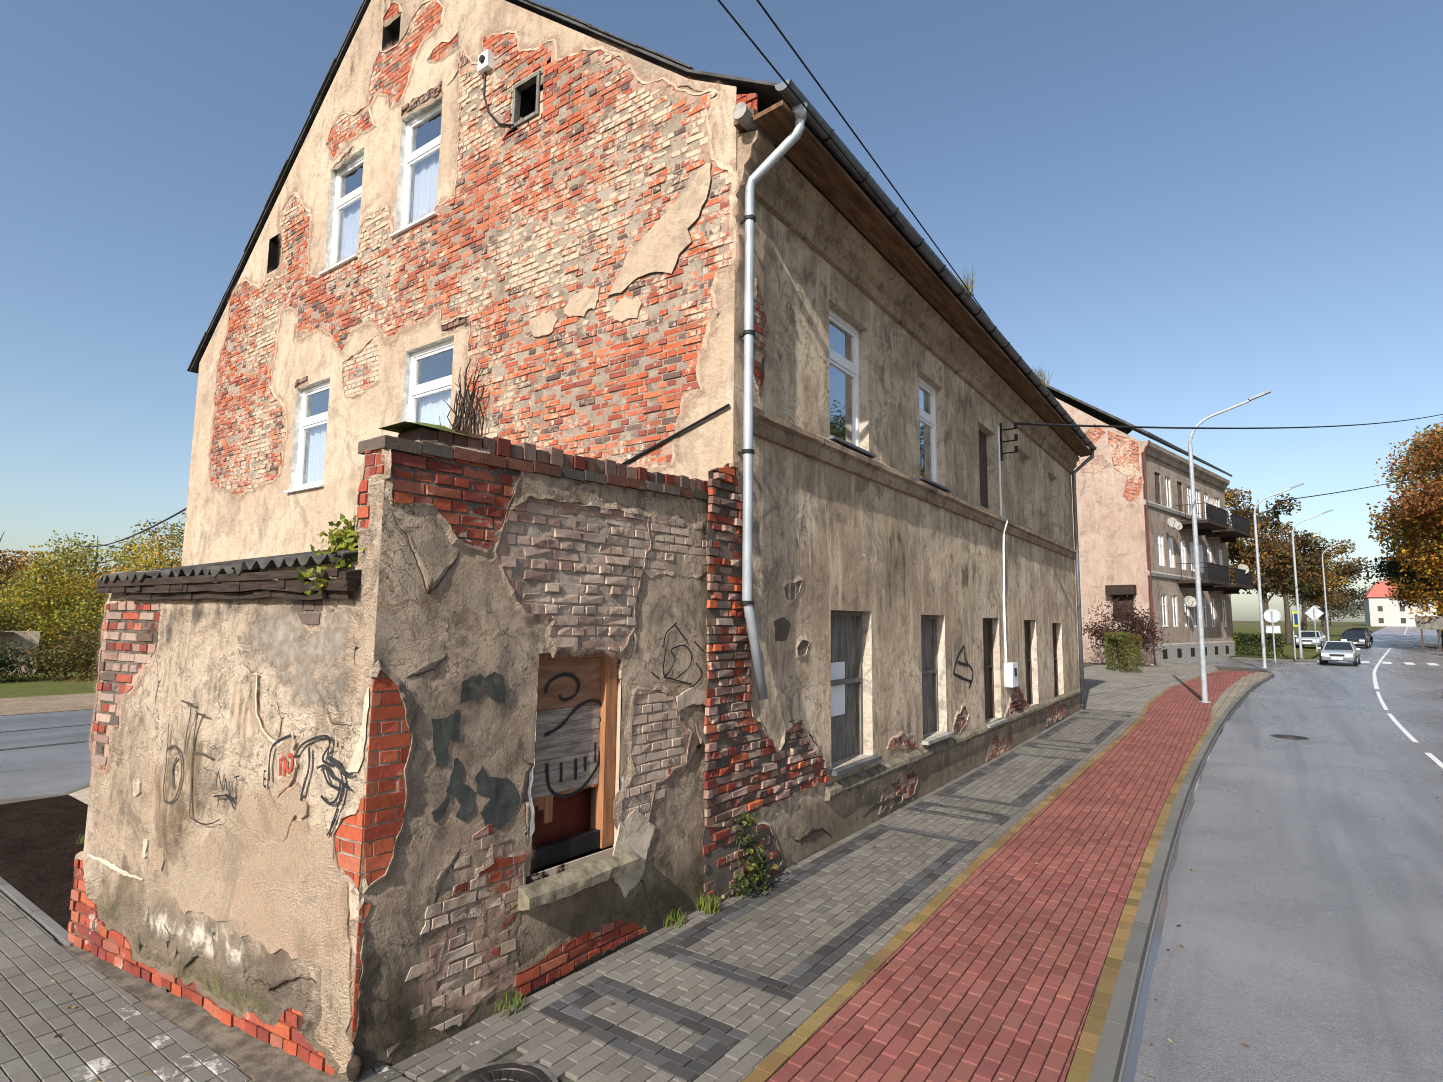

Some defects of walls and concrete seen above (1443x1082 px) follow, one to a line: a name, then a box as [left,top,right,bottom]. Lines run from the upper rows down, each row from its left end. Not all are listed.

spalling [209,0,829,1056]
efflorescence [150,914,242,961]
flaking render [68,593,417,1077]